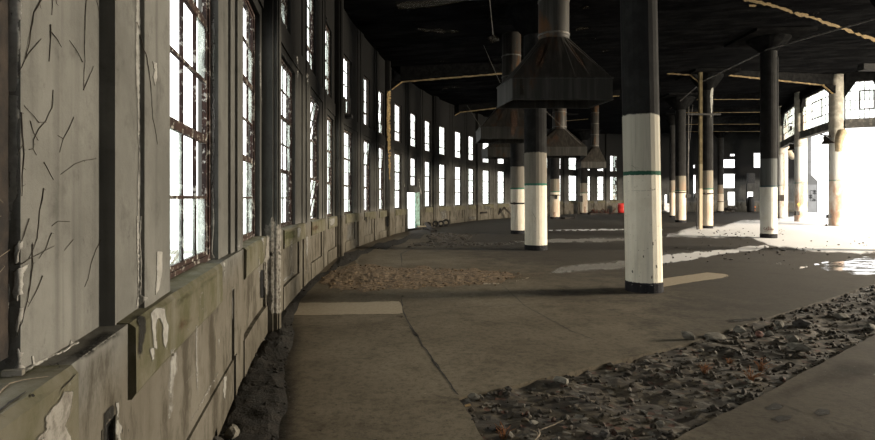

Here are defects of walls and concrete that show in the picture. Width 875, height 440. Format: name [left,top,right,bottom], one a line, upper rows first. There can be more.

peeling [8,0,22,221]
peeling [135,0,163,308]
peeling [8,241,28,332]
crack [401,298,458,394]
flaking render [38,391,73,440]